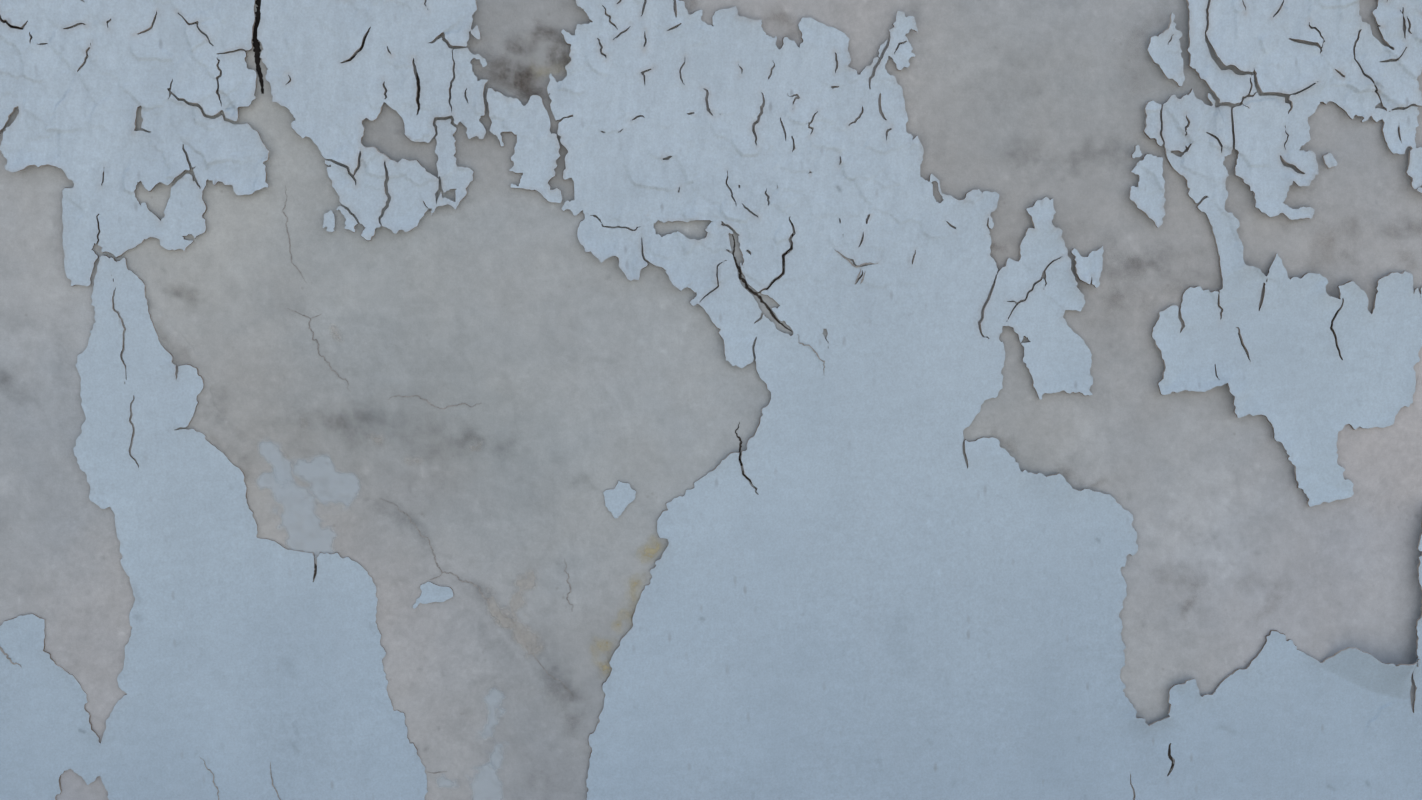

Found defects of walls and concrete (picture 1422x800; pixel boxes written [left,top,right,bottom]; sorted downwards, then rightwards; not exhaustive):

crack [252,0,264,94]
peeling [0,0,568,800]
peeling [487,0,1422,800]